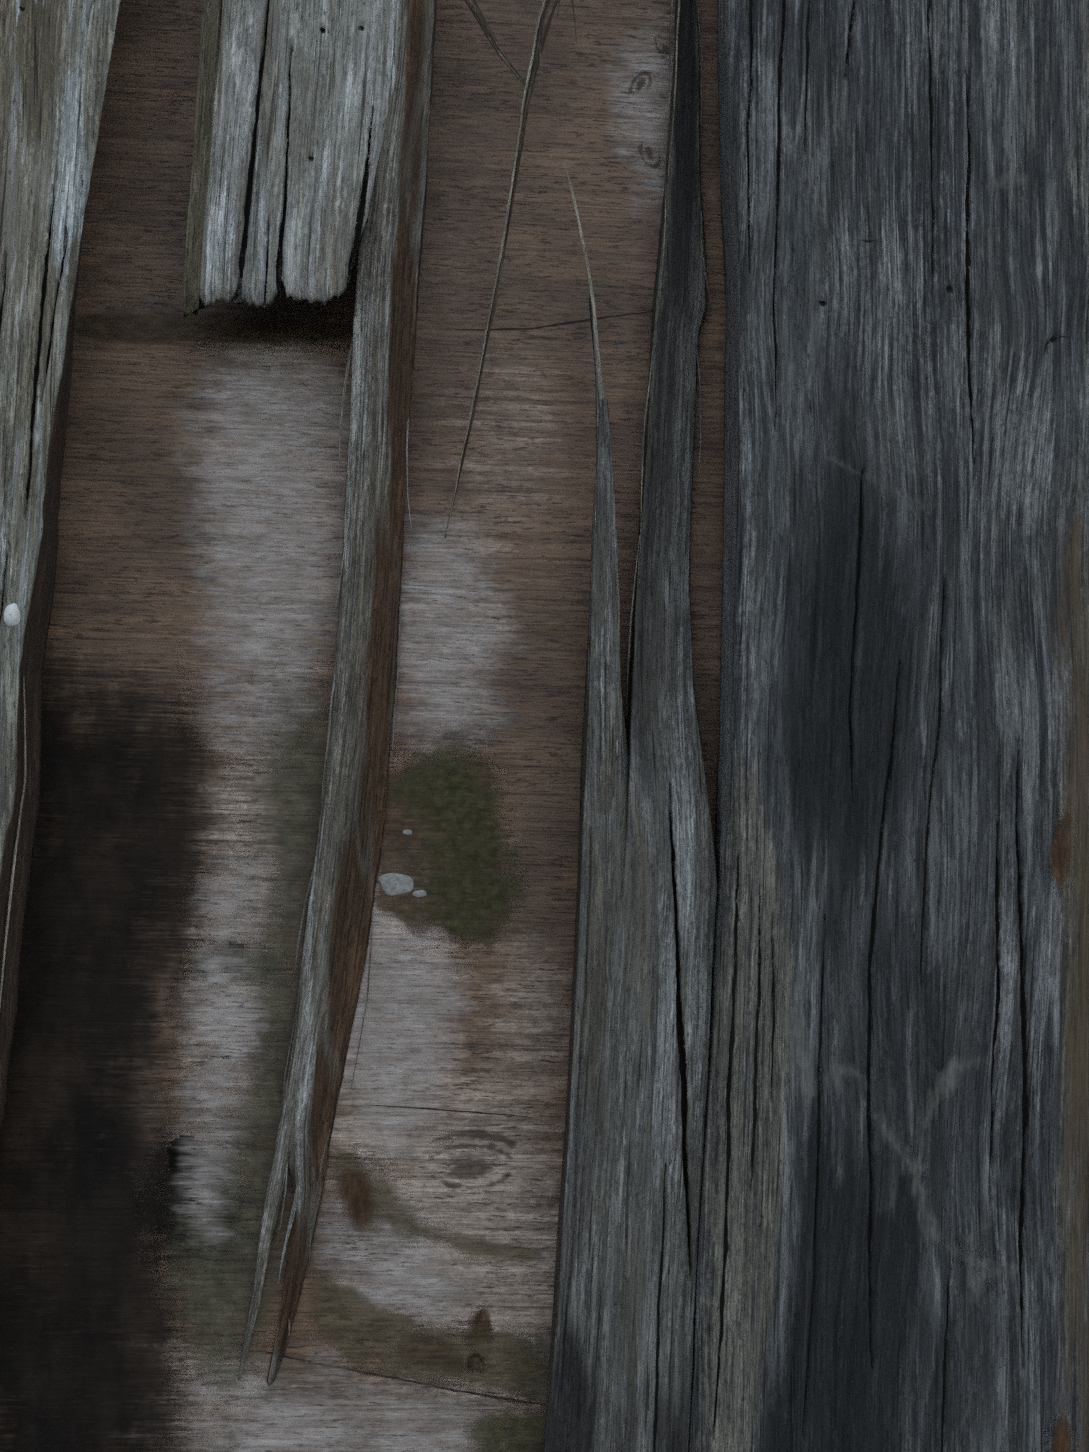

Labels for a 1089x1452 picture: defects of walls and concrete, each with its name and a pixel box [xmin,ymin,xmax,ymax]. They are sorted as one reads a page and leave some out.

crack [746,0,810,428]
crack [845,0,856,71]
damp [313,1156,550,1398]
crack [653,798,775,1452]
crack [988,755,1029,1343]